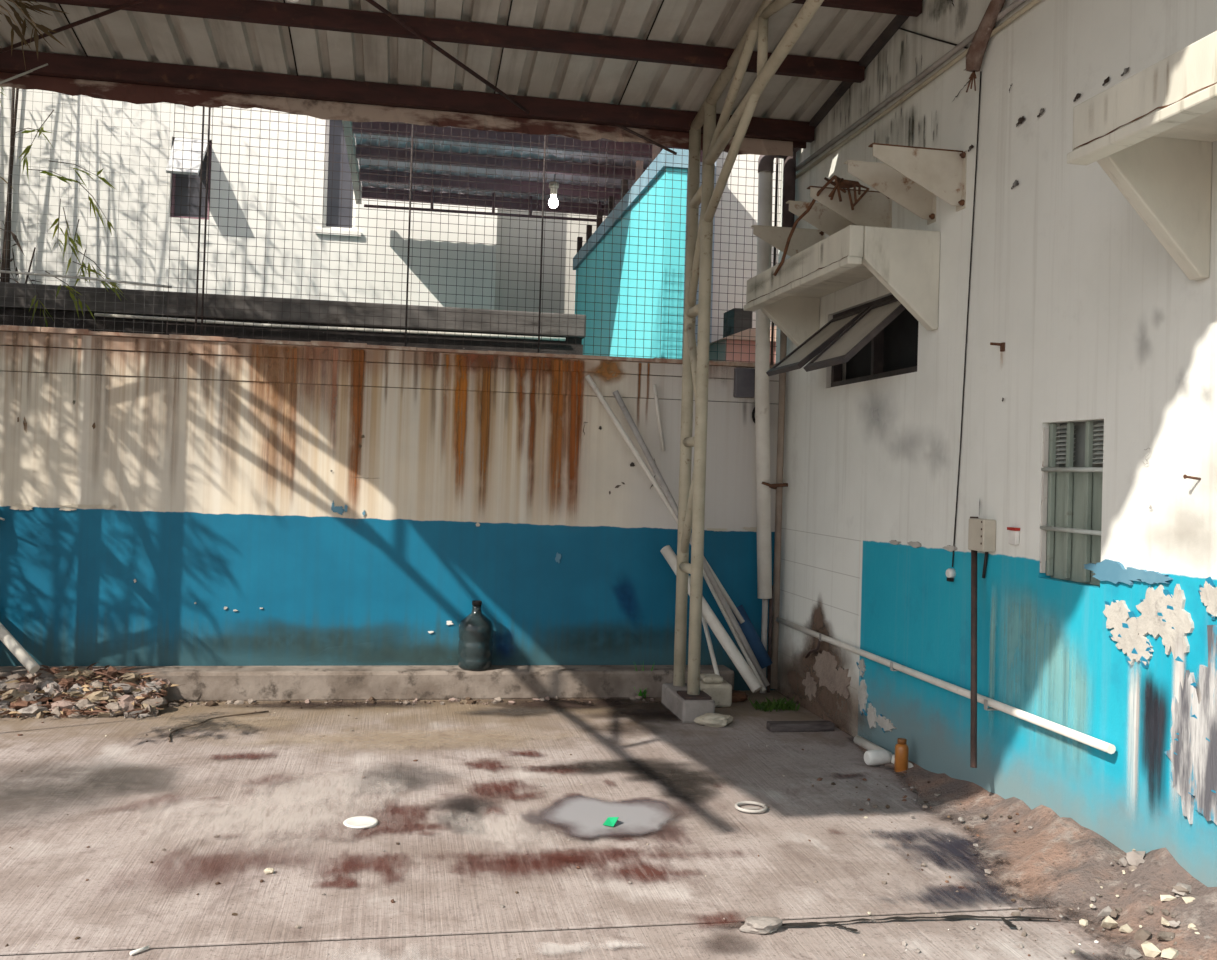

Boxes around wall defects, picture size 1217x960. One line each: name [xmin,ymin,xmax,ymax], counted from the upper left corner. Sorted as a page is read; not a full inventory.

corrosion [252,345,364,499]
corrosion [425,352,622,501]
corrosion [637,363,650,419]
peeling [802,650,897,733]
peeling [1084,559,1217,825]